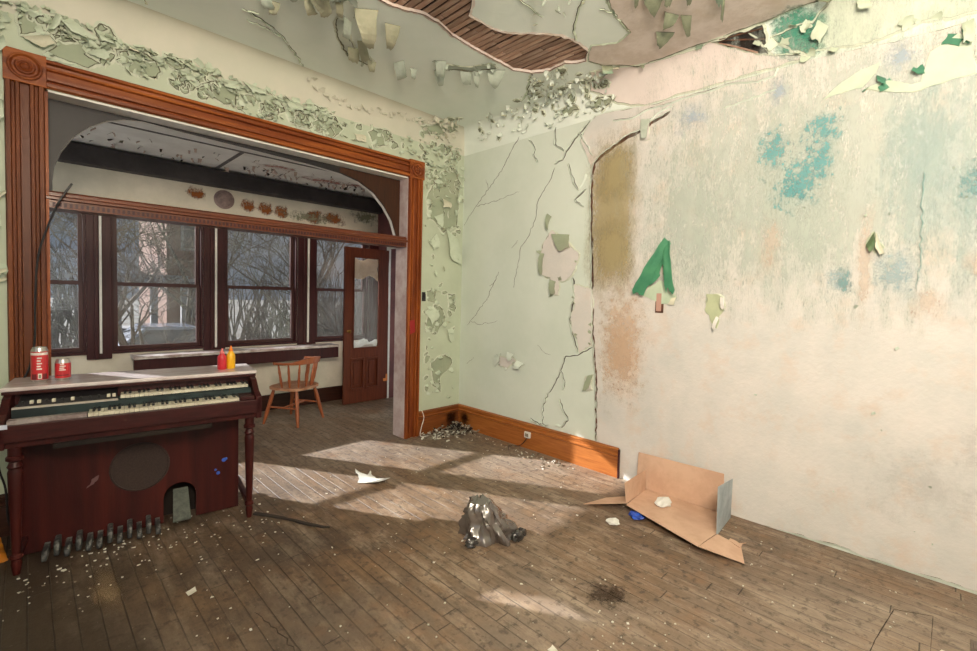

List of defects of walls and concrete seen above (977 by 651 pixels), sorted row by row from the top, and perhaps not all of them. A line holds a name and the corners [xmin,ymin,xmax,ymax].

peeling [0,0,465,398]
peeling [243,0,977,594]
damp [589,148,635,278]
crack [464,67,779,440]
damp [773,5,824,54]
damp [757,114,843,215]